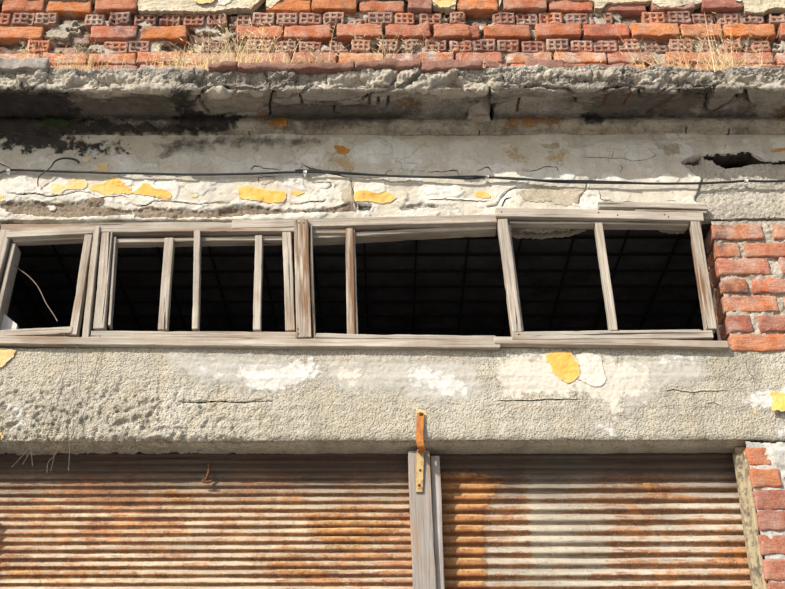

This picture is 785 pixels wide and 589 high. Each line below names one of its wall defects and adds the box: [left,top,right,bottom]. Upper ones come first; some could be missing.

spalling [0,70,177,96]
spalling [313,68,495,123]
leakage [0,82,280,159]
flaking render [0,156,396,219]
crack [402,163,561,207]
flaking render [682,148,785,222]
crack [179,396,272,404]
crack [493,395,586,403]
rust [309,513,397,552]
rust [440,472,503,589]
rust [3,565,137,579]
rust [250,552,328,580]